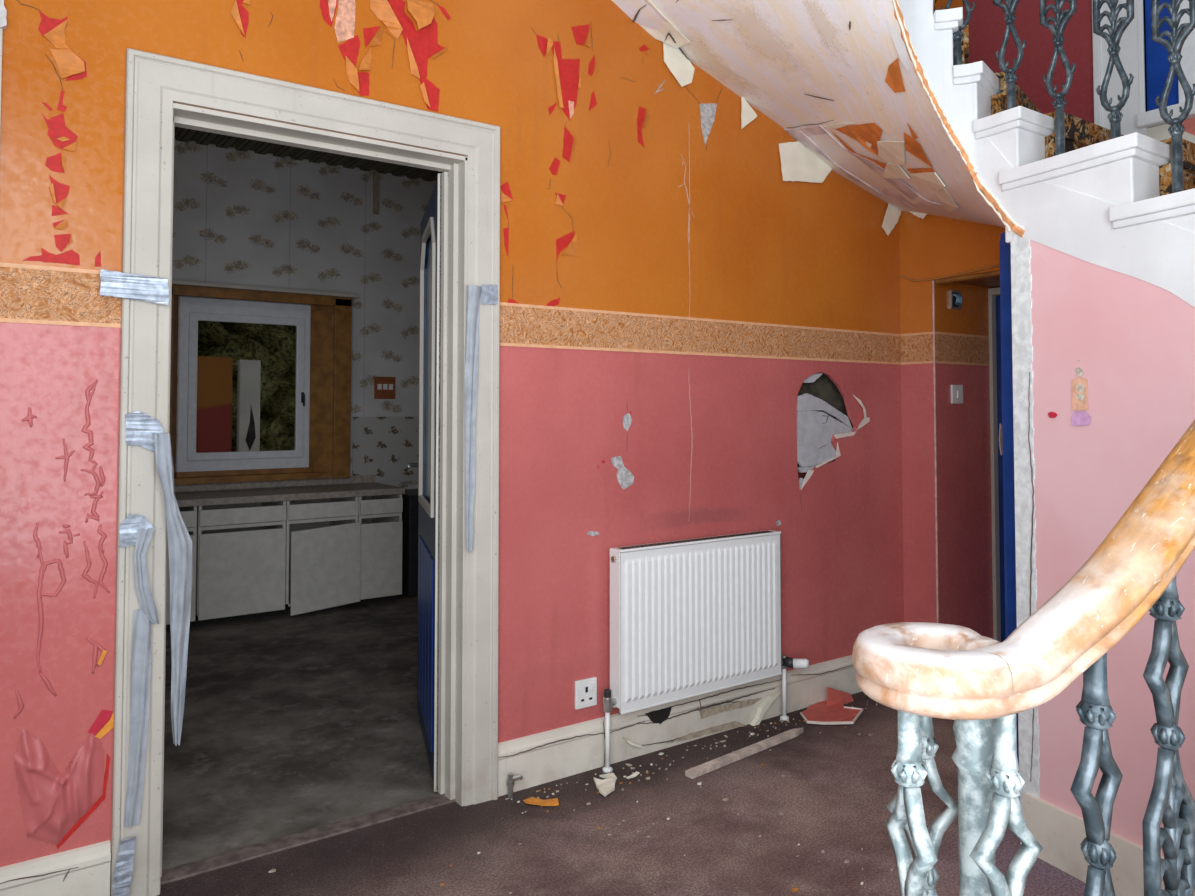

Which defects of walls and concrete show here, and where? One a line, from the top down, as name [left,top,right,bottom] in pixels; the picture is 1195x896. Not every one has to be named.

peeling [231,0,251,62]
peeling [320,0,451,112]
peeling [0,0,87,265]
peeling [531,24,598,260]
flaking render [598,456,634,490]
flaking render [623,407,632,431]
spalling [797,372,870,507]
peeling [668,698,762,743]